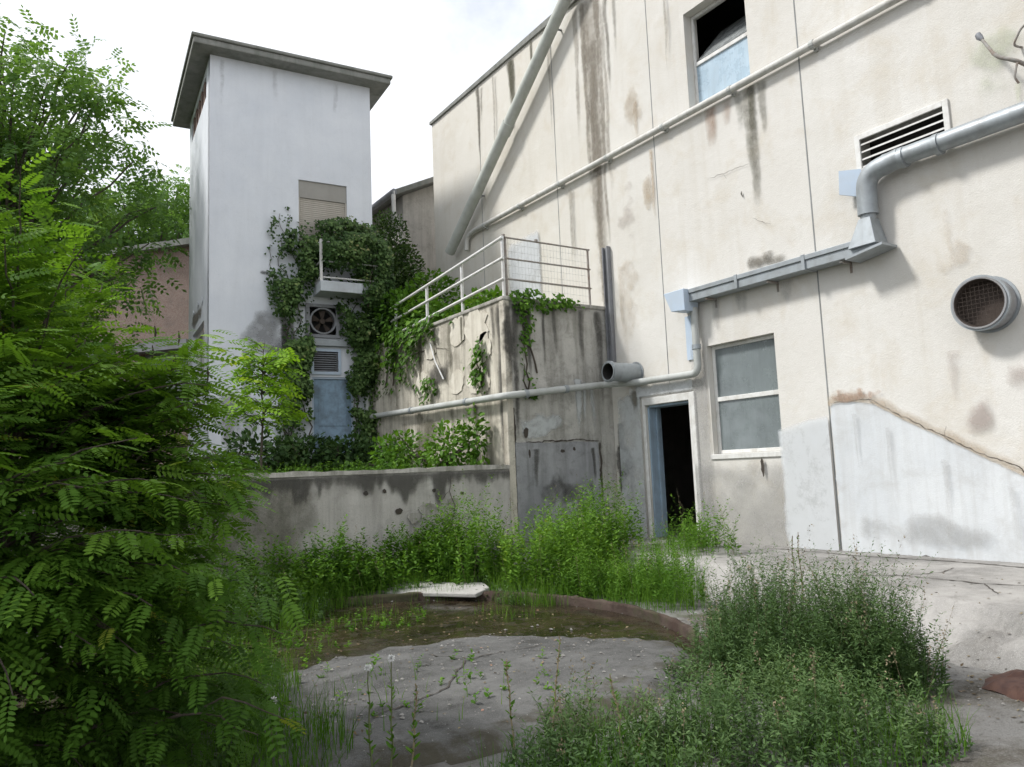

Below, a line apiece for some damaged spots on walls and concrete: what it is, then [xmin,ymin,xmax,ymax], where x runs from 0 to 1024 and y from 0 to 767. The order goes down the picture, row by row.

leakage [577,0,609,234]
leakage [748,251,782,267]
peeling [416,339,436,398]
peeling [449,309,492,394]
leakage [871,400,933,430]
leakage [173,470,510,576]